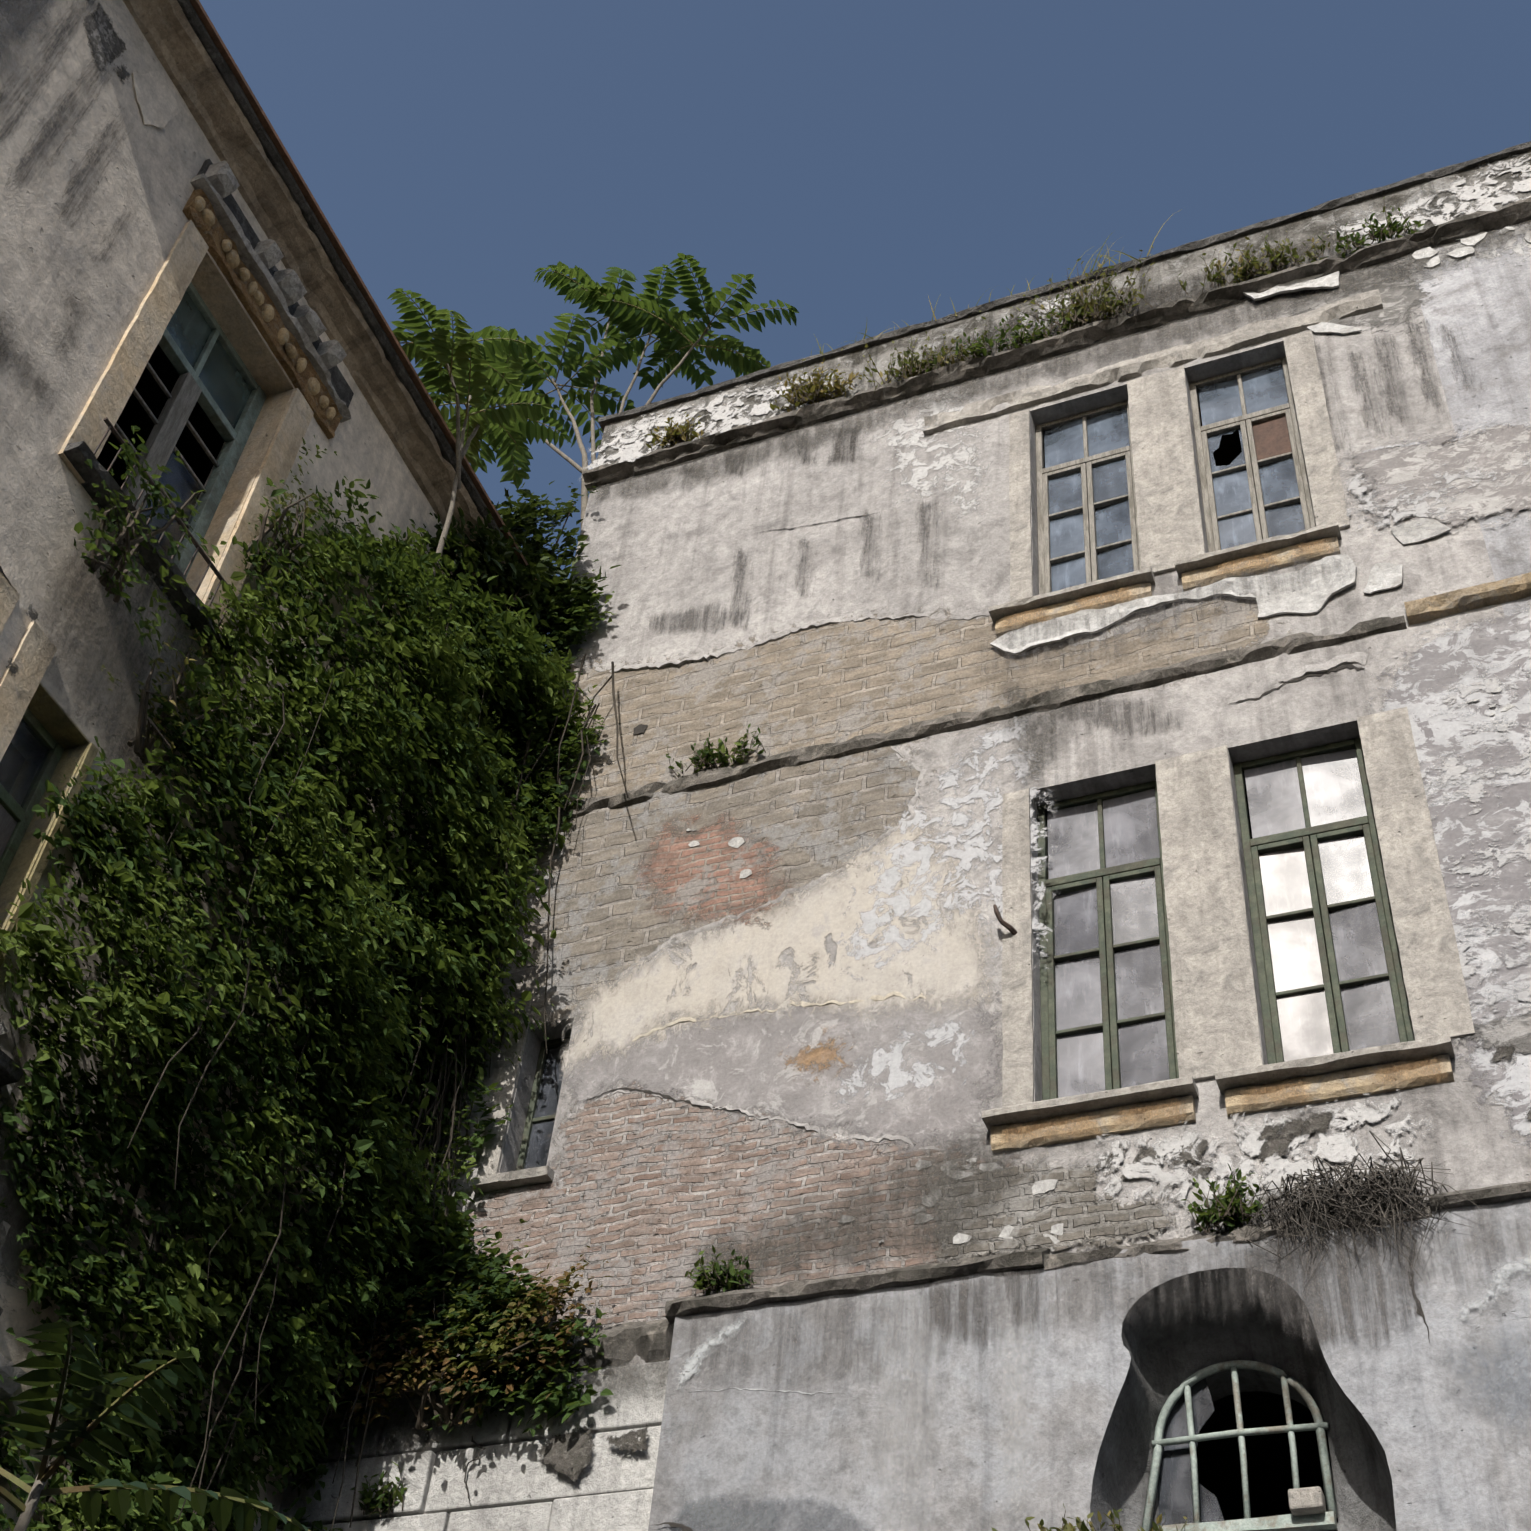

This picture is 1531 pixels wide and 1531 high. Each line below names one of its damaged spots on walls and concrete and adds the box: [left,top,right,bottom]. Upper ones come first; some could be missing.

damp [17,71,99,178]
flaking render [1243,155,1531,336]
damp [597,221,1531,498]
damp [653,550,746,631]
spalling [448,554,1428,1340]
peeling [1370,604,1531,1147]
crack [580,1087,740,1113]